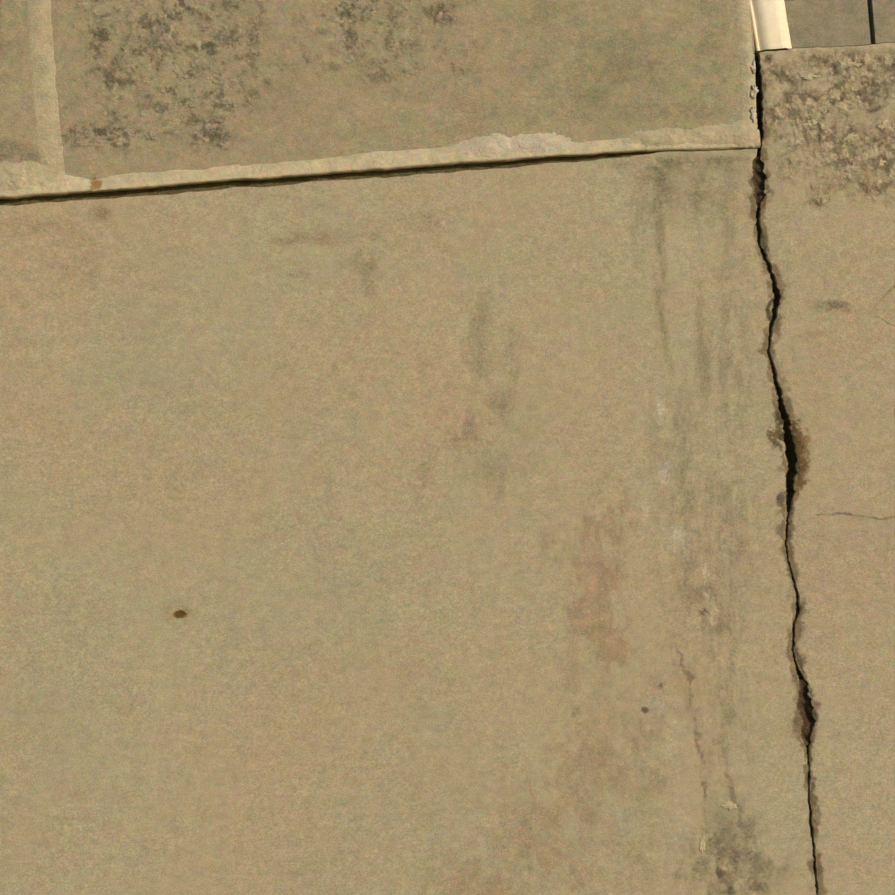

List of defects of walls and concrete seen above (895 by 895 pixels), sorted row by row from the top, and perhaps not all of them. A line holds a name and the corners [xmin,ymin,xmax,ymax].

crack [748,55,826,895]
spalling [765,51,895,206]